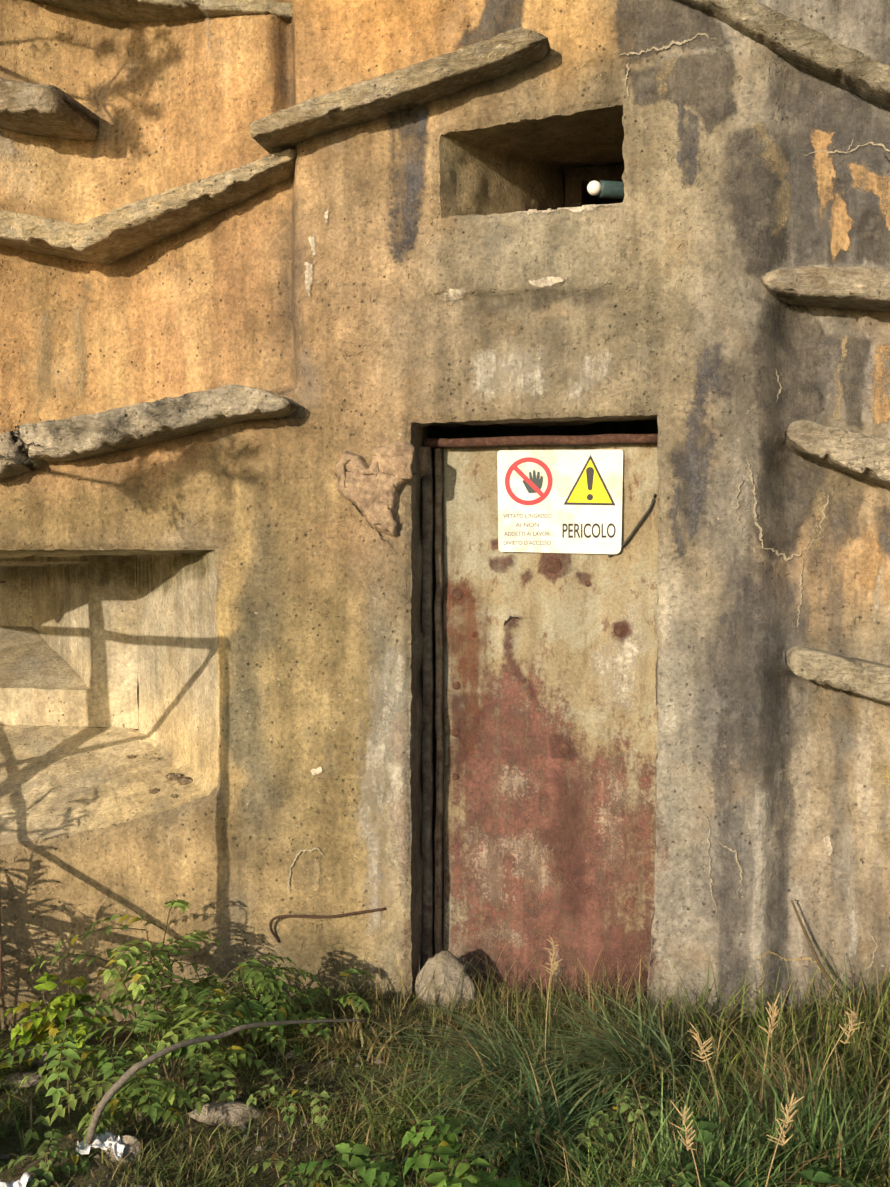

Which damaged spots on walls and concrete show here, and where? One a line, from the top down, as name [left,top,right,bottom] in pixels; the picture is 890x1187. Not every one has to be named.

damp [381,105,429,262]
damp [457,0,523,46]
crack [620,33,716,96]
damp [616,0,736,184]
damp [720,62,890,278]
peeling [811,129,852,260]
crack [803,139,890,161]
peeling [849,163,890,230]
damp [667,344,730,557]
crack [734,456,829,633]
damp [709,287,870,1019]
rust [424,581,668,1001]